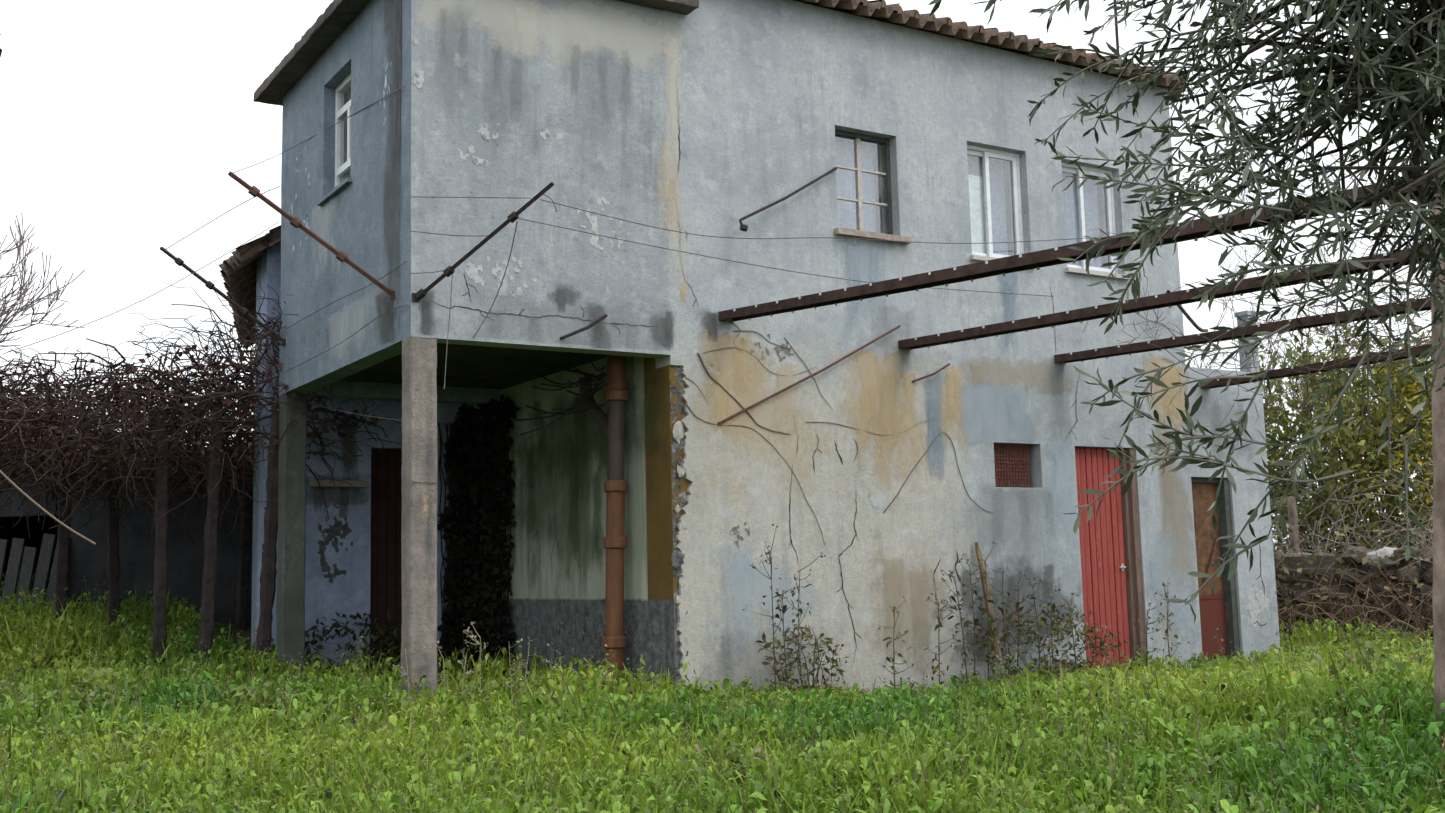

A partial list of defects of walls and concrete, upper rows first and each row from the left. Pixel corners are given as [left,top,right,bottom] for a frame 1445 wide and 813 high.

peeling [458,123,500,166]
peeling [577,196,630,250]
peeling [464,255,538,298]
flaking render [669,361,726,690]